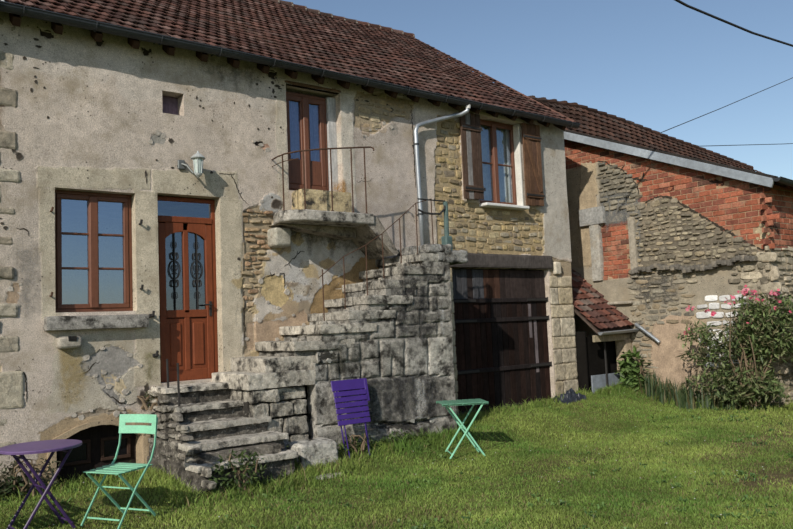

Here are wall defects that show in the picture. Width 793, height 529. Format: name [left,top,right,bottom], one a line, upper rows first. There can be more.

spalling [755,223,771,241]
flaking render [244,255,386,350]
flaking render [67,345,149,420]